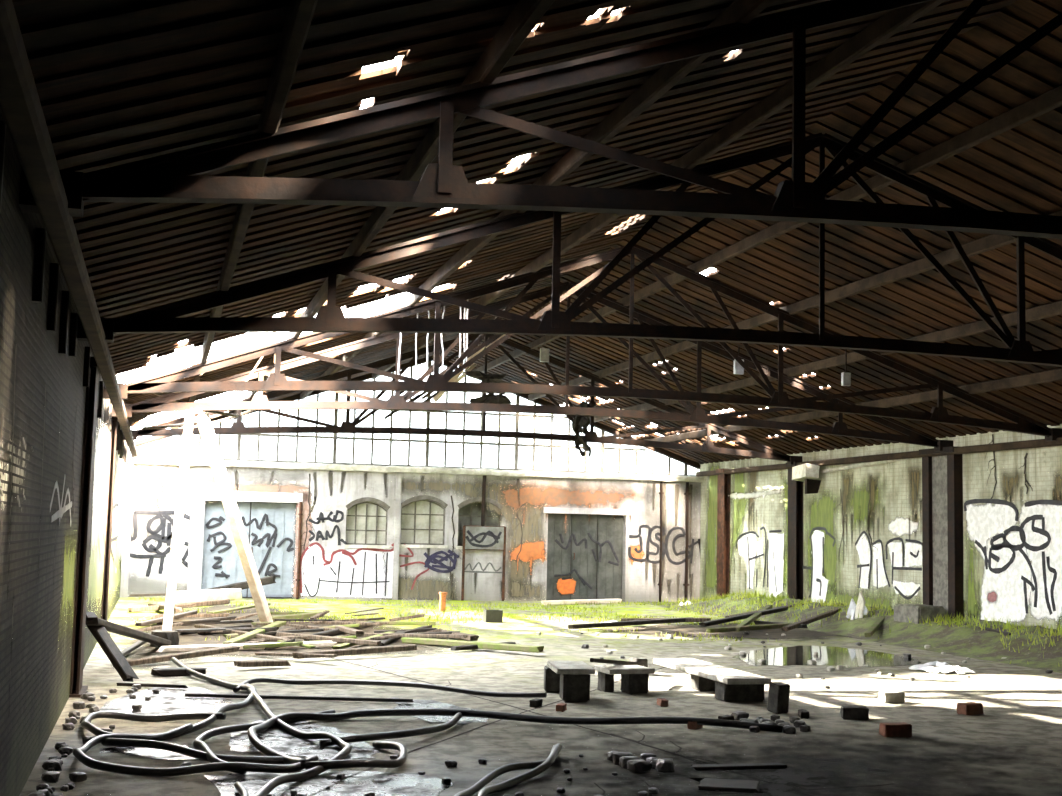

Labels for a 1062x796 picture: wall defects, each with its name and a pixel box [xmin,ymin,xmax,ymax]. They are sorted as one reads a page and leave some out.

water stain [908,468,922,539]
water stain [1001,470,1023,502]
water stain [1053,473,1062,501]
water stain [806,474,920,609]